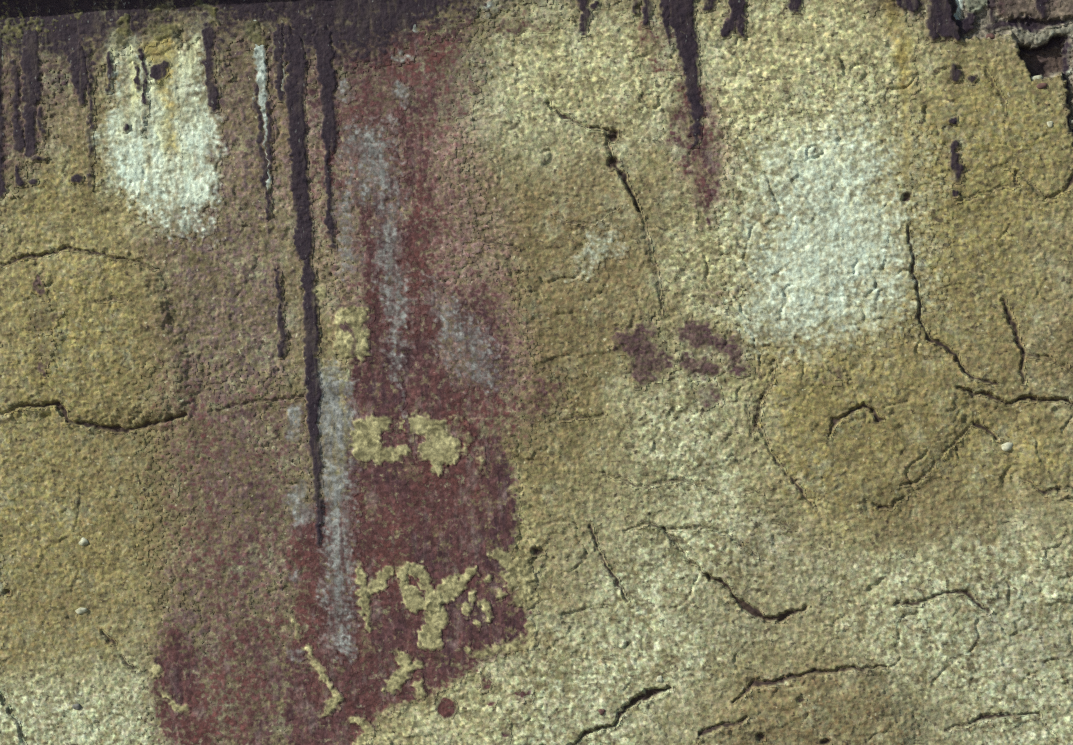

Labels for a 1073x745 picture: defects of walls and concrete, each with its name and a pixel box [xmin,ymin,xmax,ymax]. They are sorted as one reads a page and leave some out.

leakage [0,29,59,228]
leakage [67,26,233,251]
corrosion [140,39,182,157]
leakage [630,0,749,149]
leakage [783,0,803,14]
leakage [889,0,1073,133]
spalling [962,0,1073,100]
crack [0,244,160,271]
crack [0,400,189,435]
crack [872,225,1073,511]
crack [588,521,810,624]
crack [539,685,673,745]